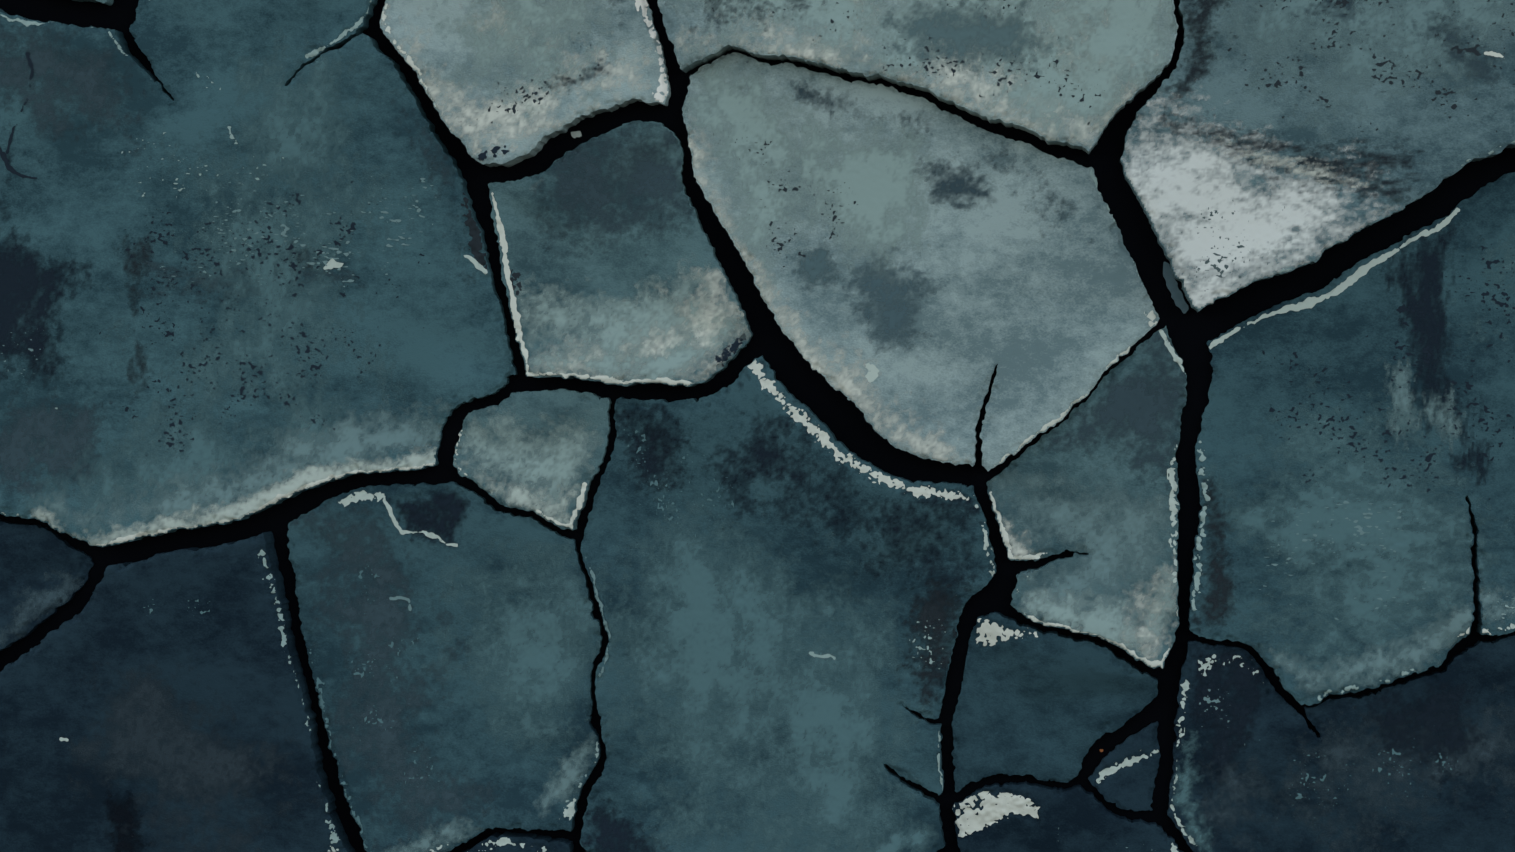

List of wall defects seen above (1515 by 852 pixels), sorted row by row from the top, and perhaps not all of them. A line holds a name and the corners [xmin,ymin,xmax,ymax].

crack [0,0,998,852]
crack [724,0,1515,852]